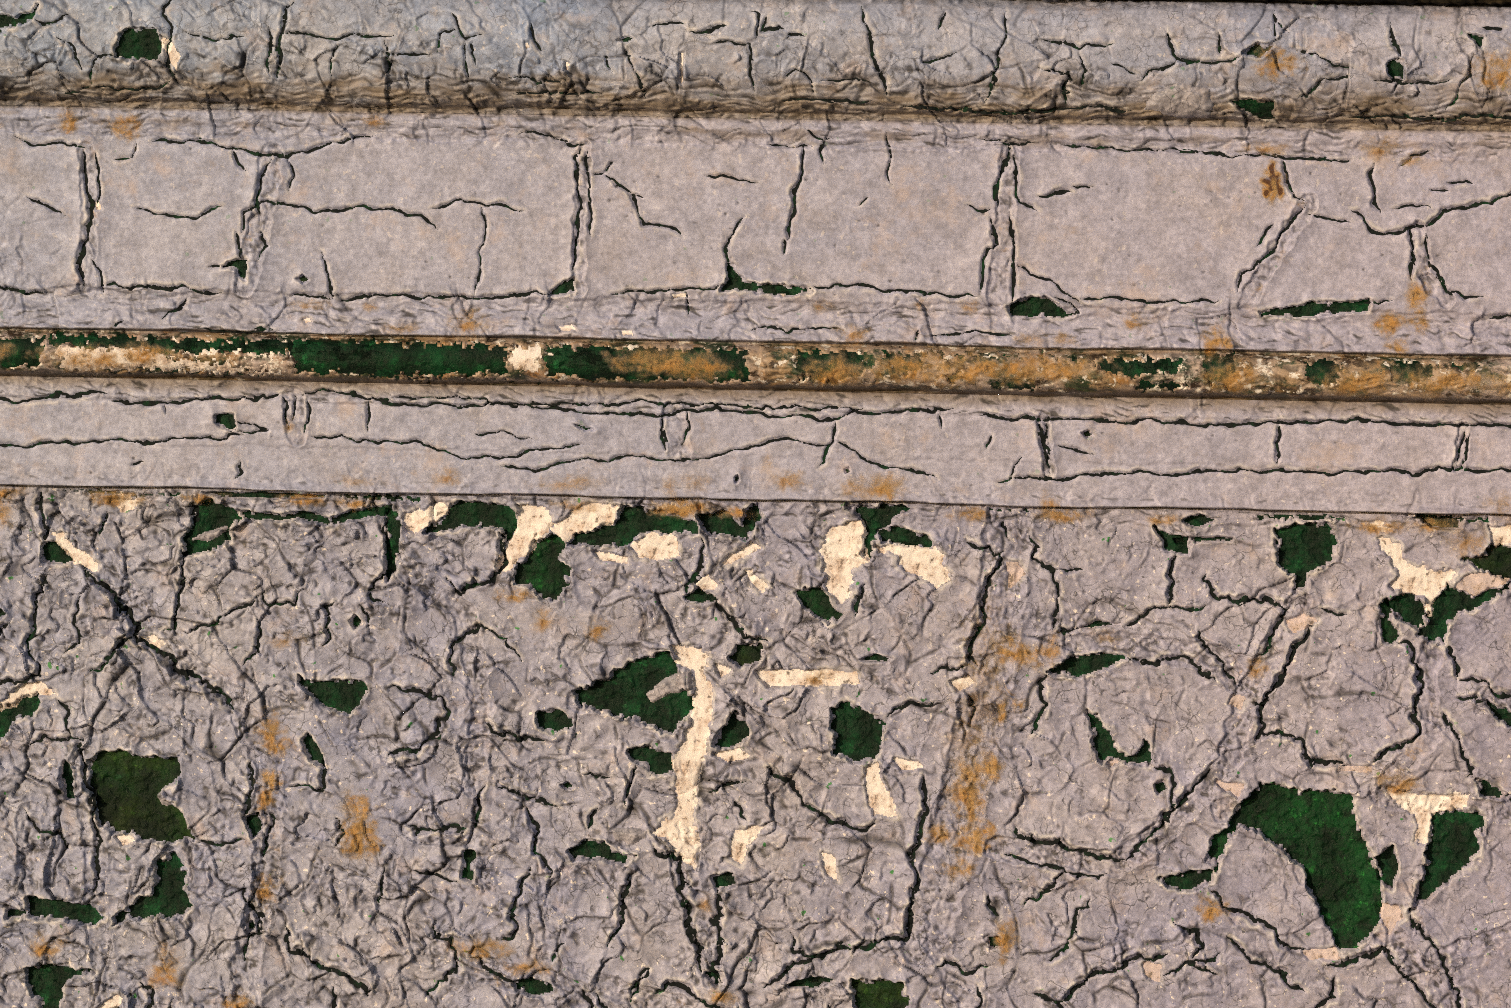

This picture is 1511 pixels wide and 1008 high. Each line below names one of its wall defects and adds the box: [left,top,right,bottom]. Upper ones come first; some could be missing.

crack [14,131,681,334]
crack [509,6,1511,340]
peeling [0,318,751,385]
crack [0,388,1511,483]
peeling [8,750,195,925]
crack [0,491,395,897]
peeling [183,491,768,603]
peeling [537,643,923,870]
crack [987,766,1461,1008]
crack [1126,556,1511,777]
peeling [1158,779,1511,960]
peeling [1364,513,1511,644]